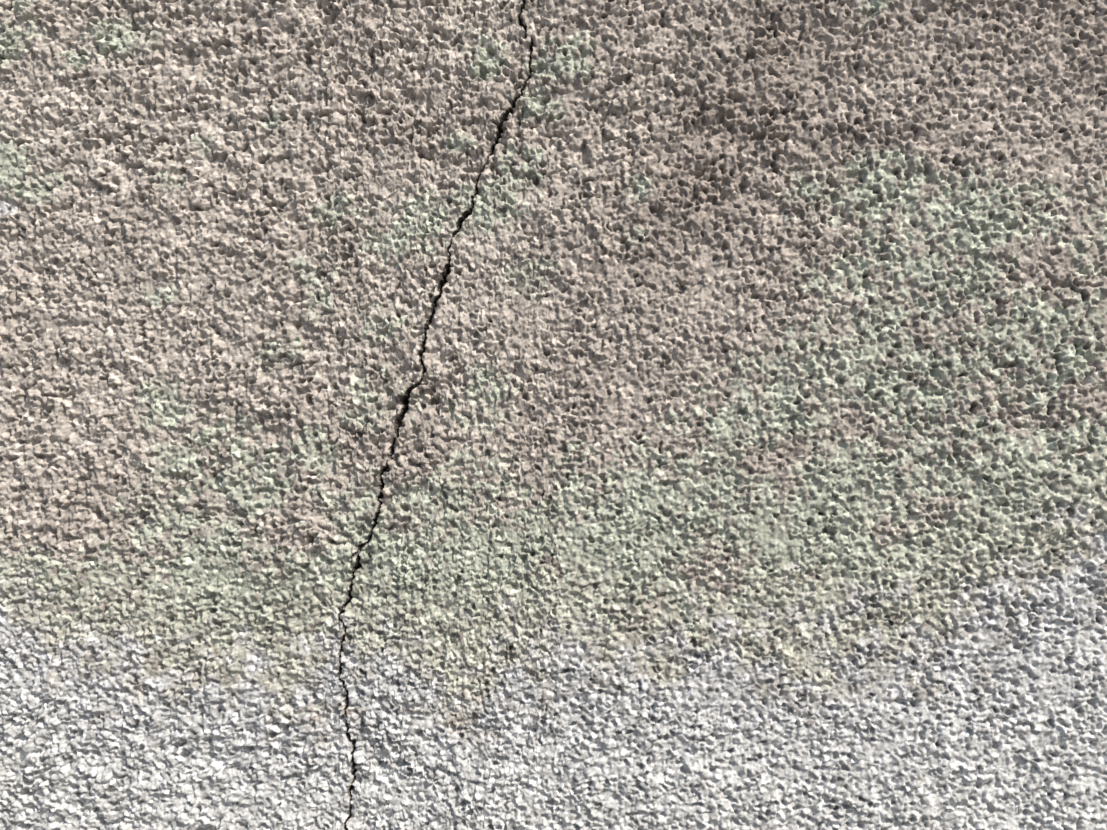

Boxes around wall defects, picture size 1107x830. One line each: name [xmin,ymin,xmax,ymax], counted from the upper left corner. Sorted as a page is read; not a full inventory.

crack [337,0,534,830]